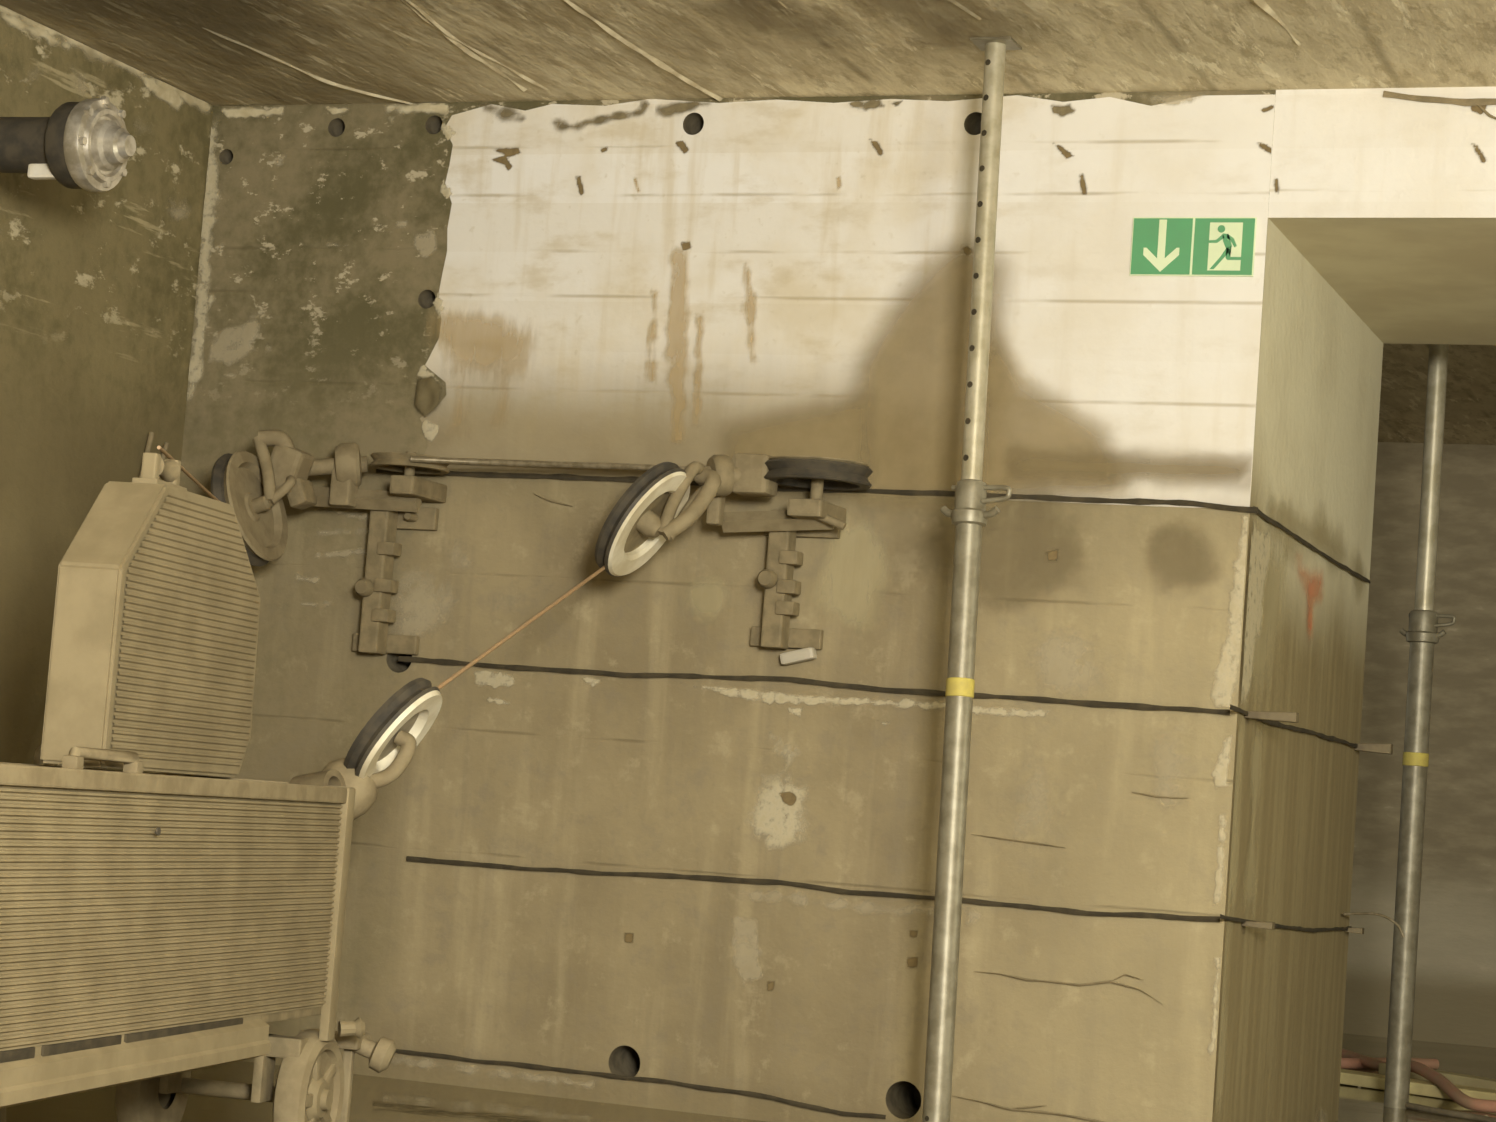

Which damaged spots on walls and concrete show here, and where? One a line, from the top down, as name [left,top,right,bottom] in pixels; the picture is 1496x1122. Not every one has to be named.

peeling [441,124,455,140]
peeling [417,365,437,381]
peeling [422,420,438,441]
spalling [1211,516,1271,707]
spalling [1212,738,1231,787]
spalling [780,792,796,806]
spalling [1214,816,1226,903]
crack [974,971,1162,1004]
spalling [1208,958,1220,1052]
crack [951,1095,1105,1122]